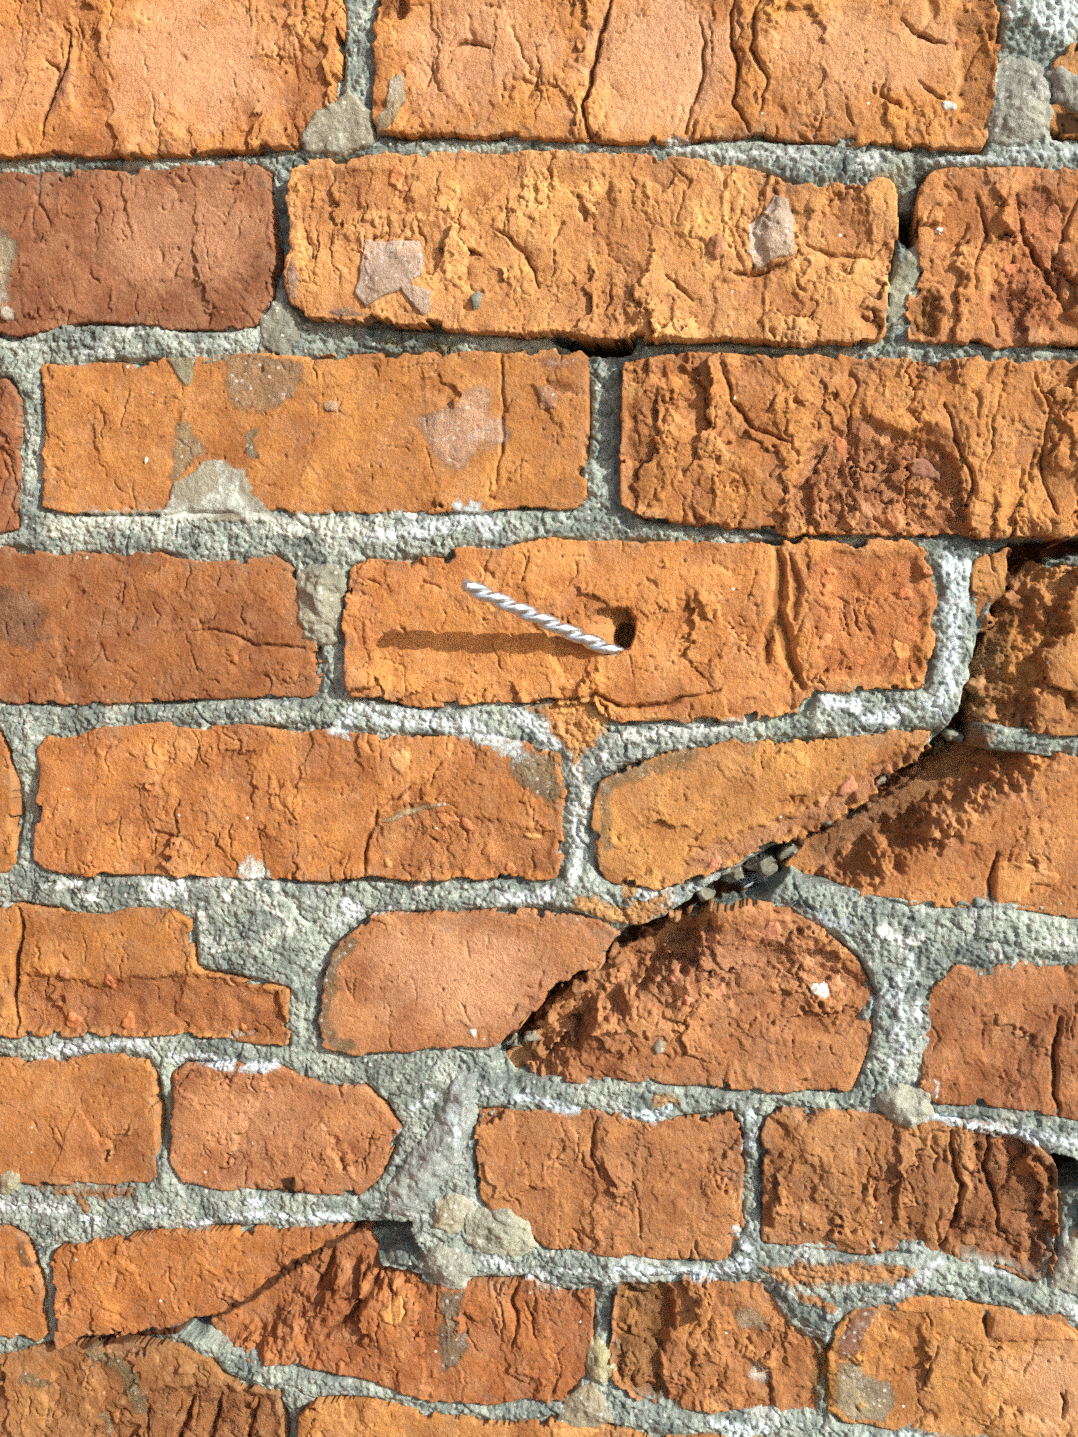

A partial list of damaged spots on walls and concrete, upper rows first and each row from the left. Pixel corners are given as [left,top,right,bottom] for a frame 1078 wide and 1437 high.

crack [726,380,780,440]
crack [504,400,1078,1059]
crack [1051,1023,1059,1113]
crack [945,1136,998,1238]
crack [80,1220,365,1349]
crack [511,1291,534,1328]